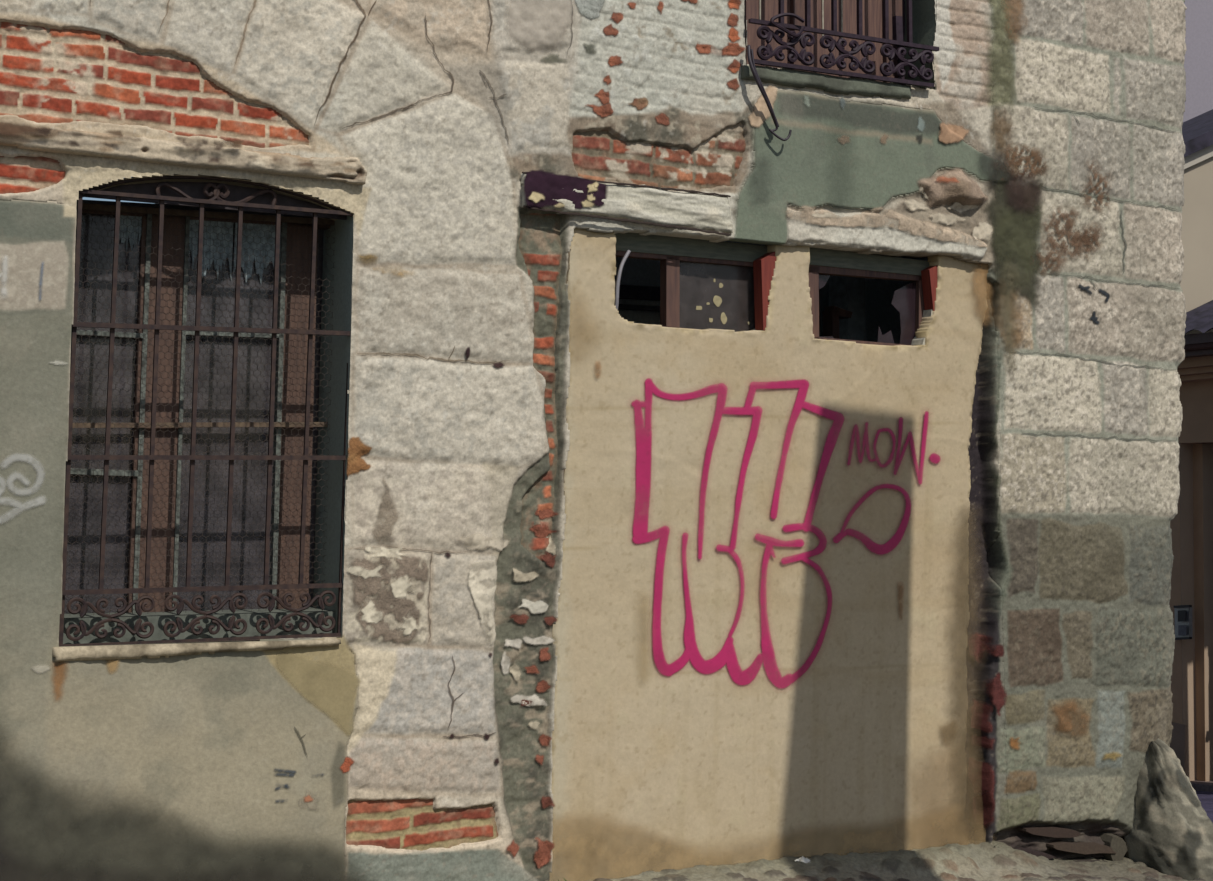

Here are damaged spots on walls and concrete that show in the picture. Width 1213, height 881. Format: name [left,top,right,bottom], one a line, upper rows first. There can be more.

flaking render [0,22,309,148]